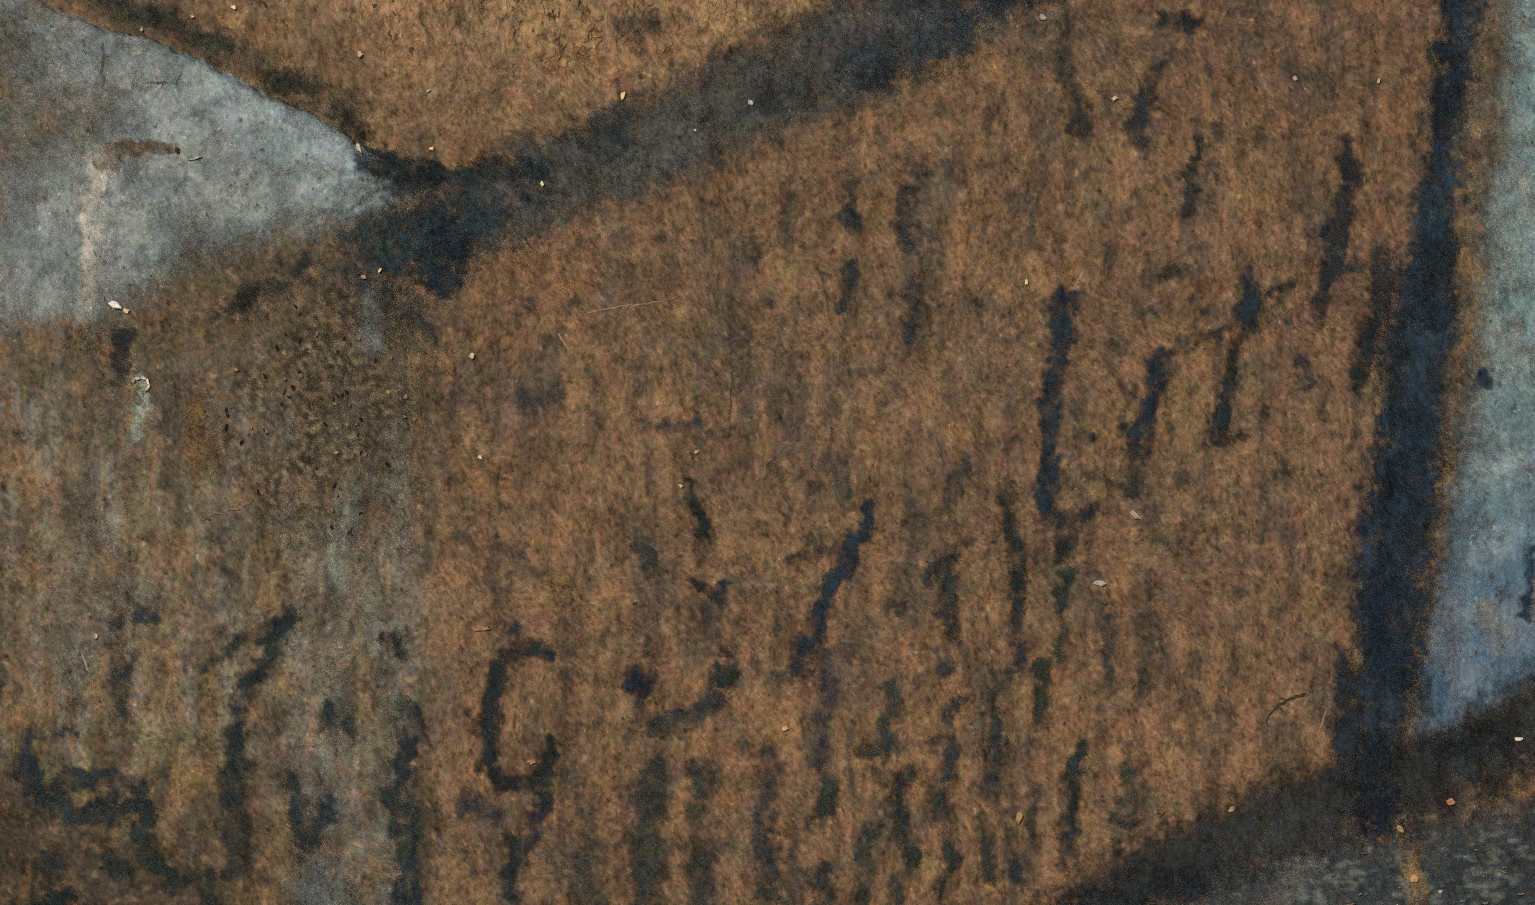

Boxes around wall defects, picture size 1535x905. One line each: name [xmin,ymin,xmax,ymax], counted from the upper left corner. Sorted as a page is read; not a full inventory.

water stain [199,34,315,97]
efflorescence [75,145,110,313]
water stain [237,259,309,311]
water stain [336,0,1035,357]
water stain [111,328,153,443]
efflorescence [323,407,395,598]
water stain [1051,0,1535,905]
water stain [976,494,1075,885]
water stain [630,755,669,905]
water stain [685,760,707,825]